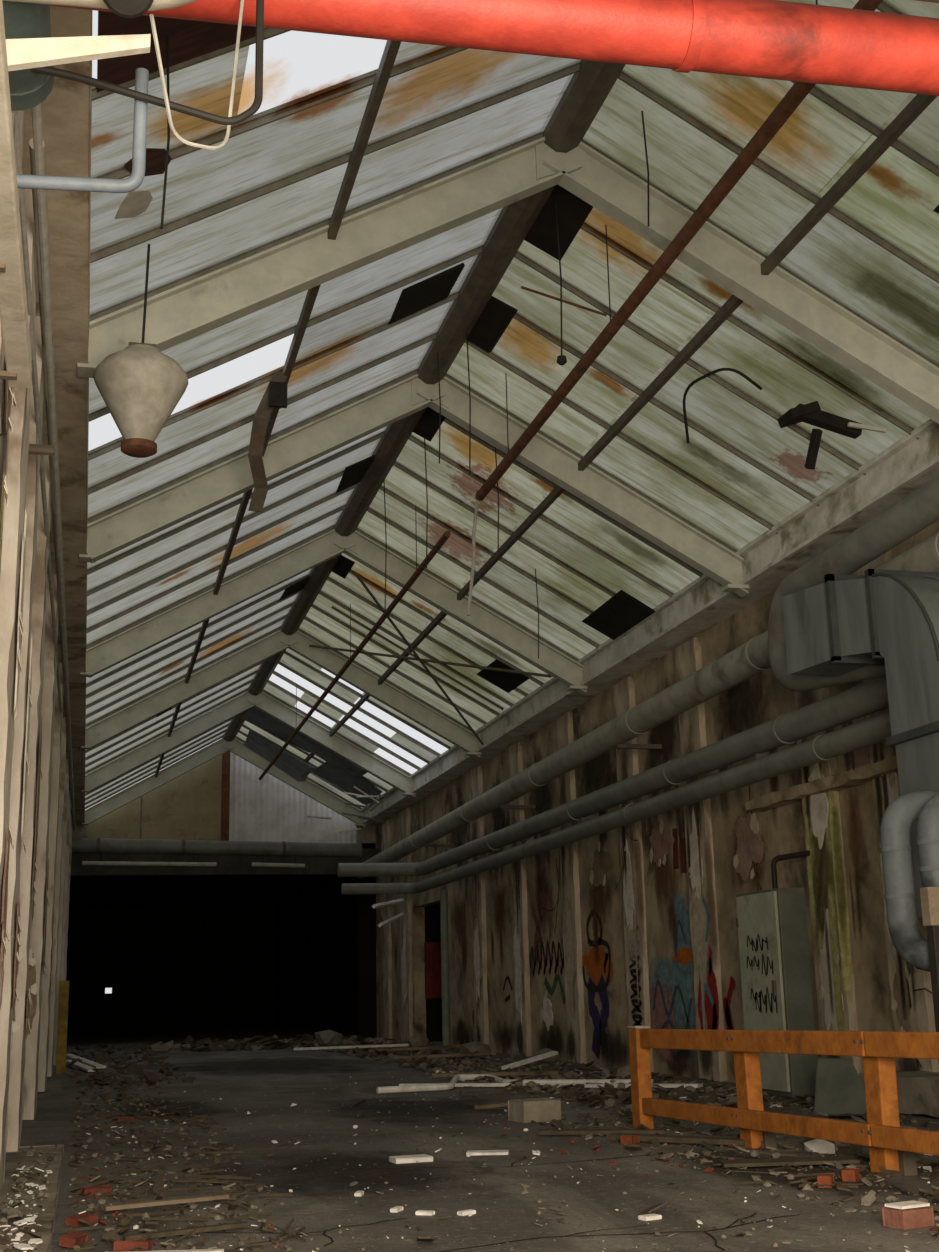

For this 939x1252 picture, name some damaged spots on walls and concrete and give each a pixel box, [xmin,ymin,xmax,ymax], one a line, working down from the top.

leakage [720,673,762,739]
leakage [530,775,565,814]
leakage [583,752,626,793]
leakage [648,718,675,768]
leakage [868,744,889,826]
leakage [458,842,523,998]
leakage [676,802,716,1029]
leakage [803,766,845,1031]
leakage [539,1027,575,1058]
leakage [668,1049,713,1082]